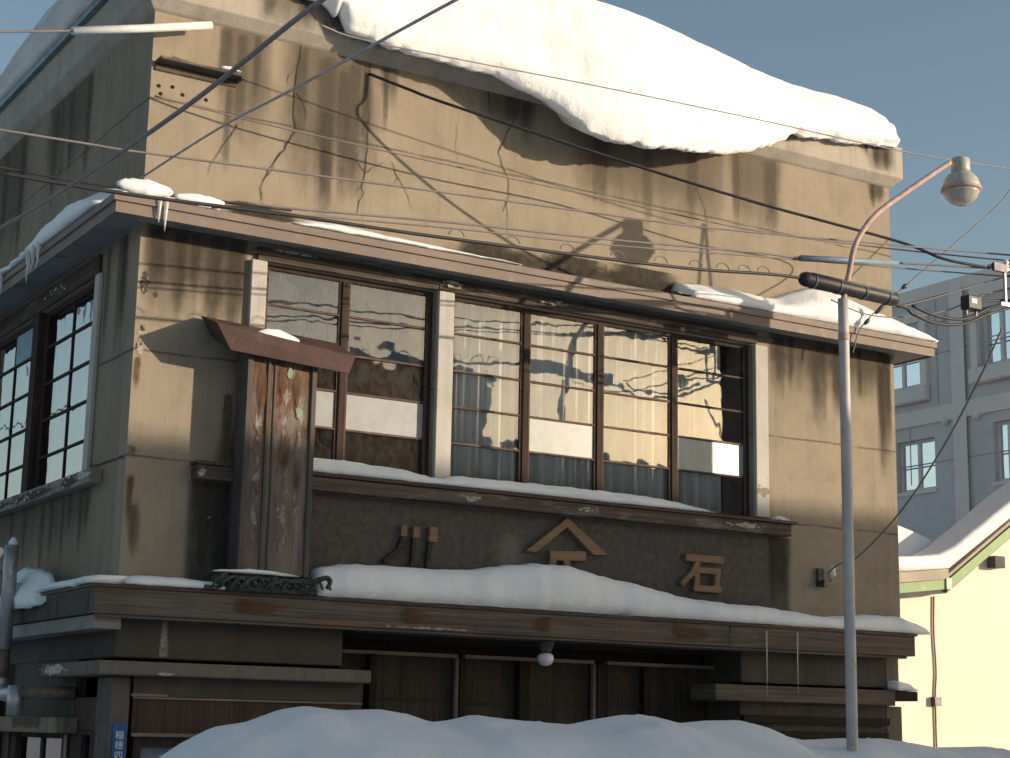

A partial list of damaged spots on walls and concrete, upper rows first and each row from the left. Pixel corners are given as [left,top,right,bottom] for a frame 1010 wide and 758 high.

water stain [149,224,246,315]
water stain [239,201,272,218]
crack [260,45,307,198]
crack [353,62,411,211]
water stain [466,242,515,261]
crack [488,91,520,244]
water stain [551,254,598,276]
water stain [870,184,882,199]
water stain [865,144,890,162]
water stain [771,333,891,434]